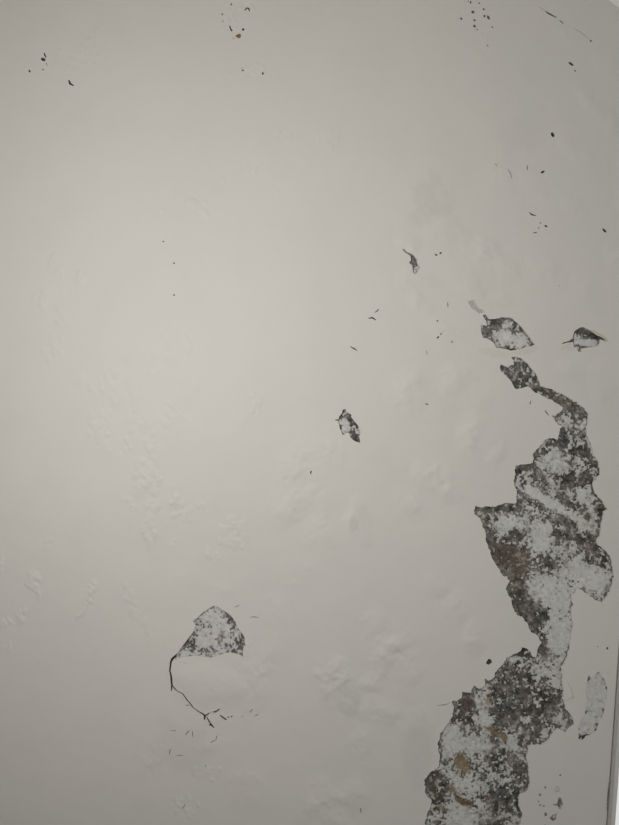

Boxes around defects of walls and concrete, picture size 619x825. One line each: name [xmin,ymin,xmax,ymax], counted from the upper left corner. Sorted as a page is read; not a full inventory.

flaking render [403,249,419,274]
flaking render [336,409,361,443]
flaking render [424,300,614,825]
flaking render [176,606,251,663]
crack [169,653,259,756]